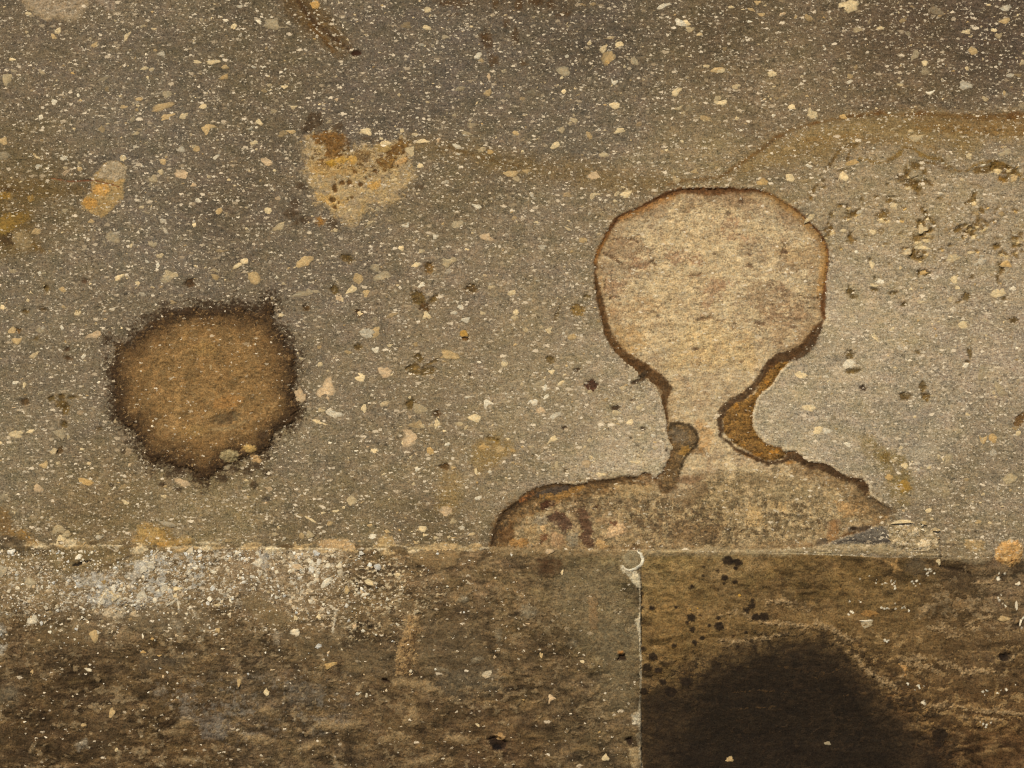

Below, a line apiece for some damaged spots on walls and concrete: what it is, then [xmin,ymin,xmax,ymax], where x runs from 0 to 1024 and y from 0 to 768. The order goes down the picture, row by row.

spalling [377,161,1024,743]
damp [814,519,963,621]